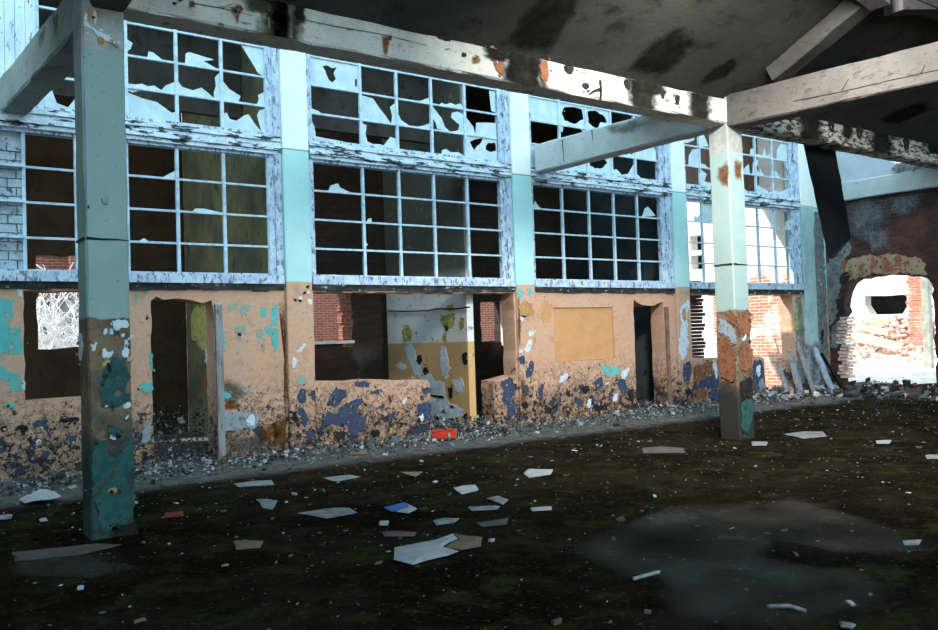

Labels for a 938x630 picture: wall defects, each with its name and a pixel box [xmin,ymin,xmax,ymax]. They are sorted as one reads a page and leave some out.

spalling [891,163,922,173]
peeling [0,289,28,408]
peeling [0,414,77,458]
crack [76,235,129,243]
peeling [75,320,155,538]
peeling [289,344,383,442]
flaking render [395,303,469,428]
peeling [500,288,636,418]
peeling [678,288,765,437]
flaking render [814,211,927,390]